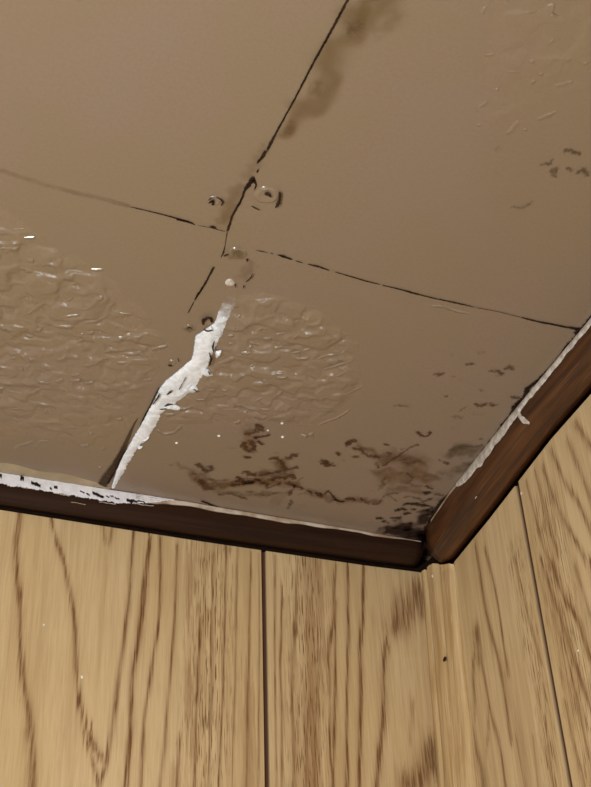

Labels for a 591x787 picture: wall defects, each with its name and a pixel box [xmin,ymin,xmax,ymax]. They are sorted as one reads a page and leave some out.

peeling [0,311,421,542]
damp [240,424,270,459]
damp [192,454,376,503]
damp [345,439,433,559]